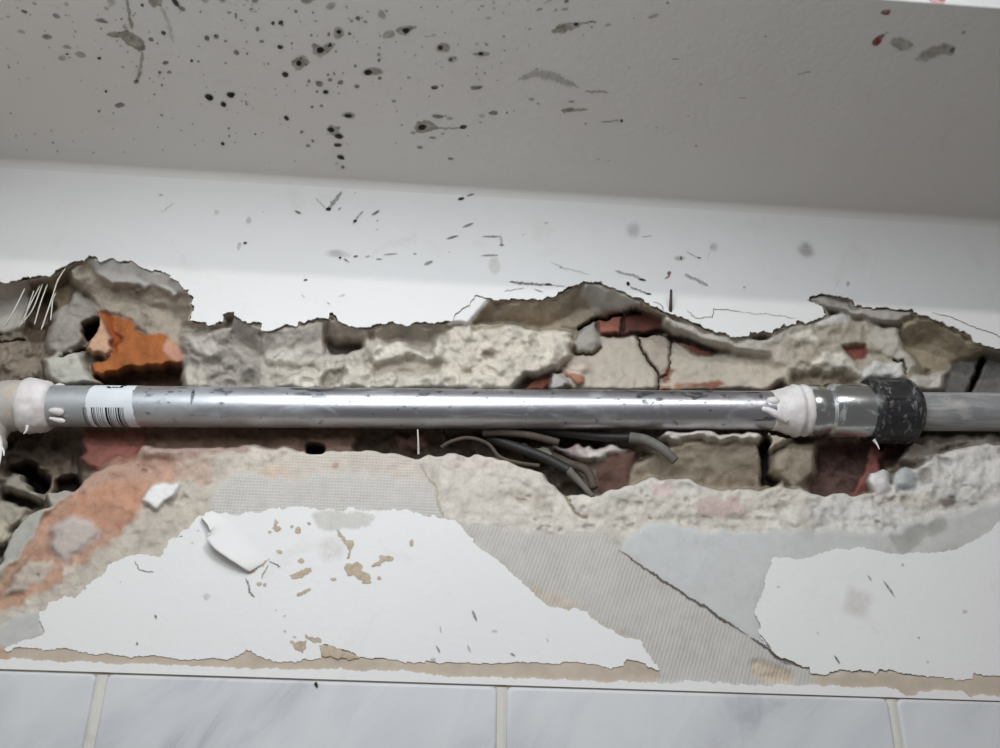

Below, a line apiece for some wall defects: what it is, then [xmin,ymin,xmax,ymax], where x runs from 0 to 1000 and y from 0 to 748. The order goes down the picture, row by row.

spalling [0,256,1000,393]
spalling [0,427,1000,702]